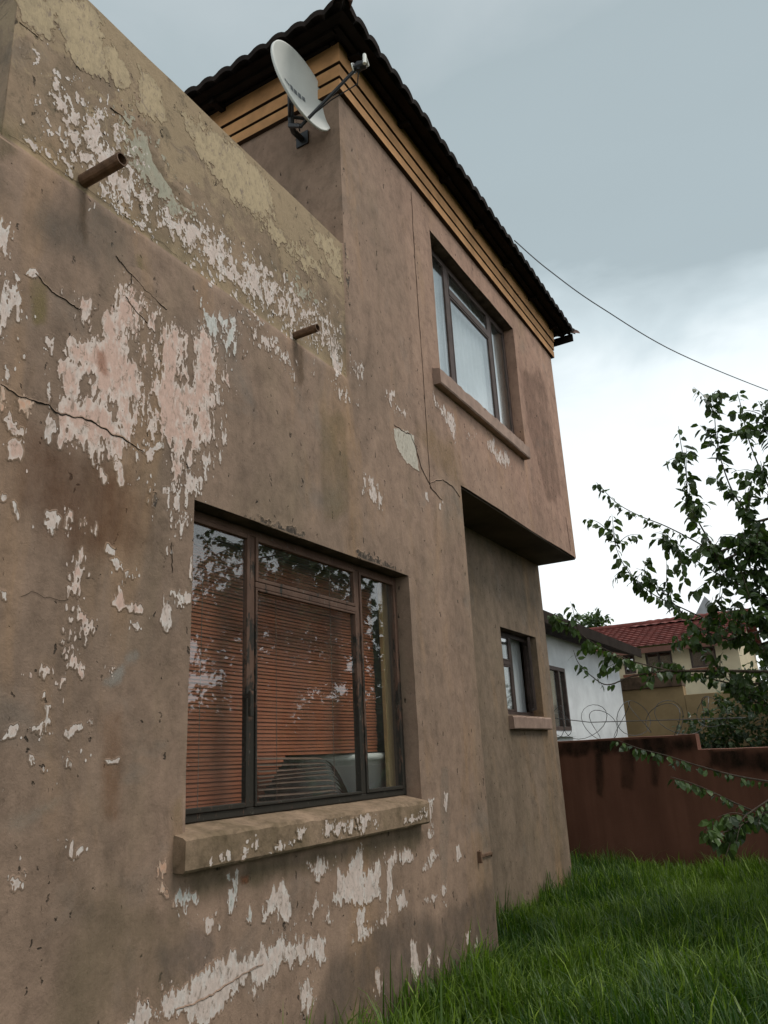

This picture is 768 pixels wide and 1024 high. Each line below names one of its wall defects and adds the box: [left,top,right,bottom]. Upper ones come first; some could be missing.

crack [116,255,167,323]
peeling [0,0,364,556]
crack [395,195,457,499]
crack [1,384,144,452]
peeling [385,389,420,472]
peeling [433,394,510,470]
peeling [0,545,97,770]
peeling [104,756,121,766]
peeling [8,856,28,894]
peeling [65,836,88,861]
peeling [124,791,449,1024]